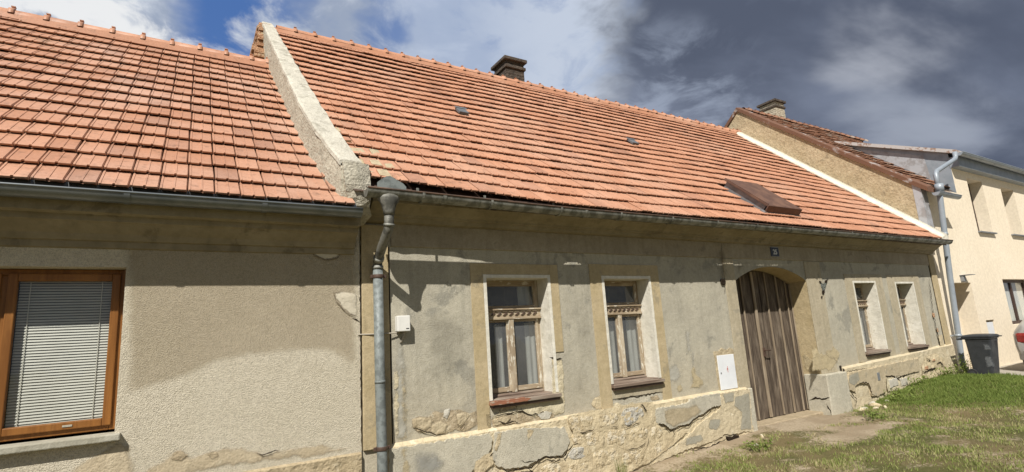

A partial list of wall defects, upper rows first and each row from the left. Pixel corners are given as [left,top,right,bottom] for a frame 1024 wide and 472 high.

spalling [887,354,949,392]
spalling [412,359,687,472]
crack [615,392,739,451]